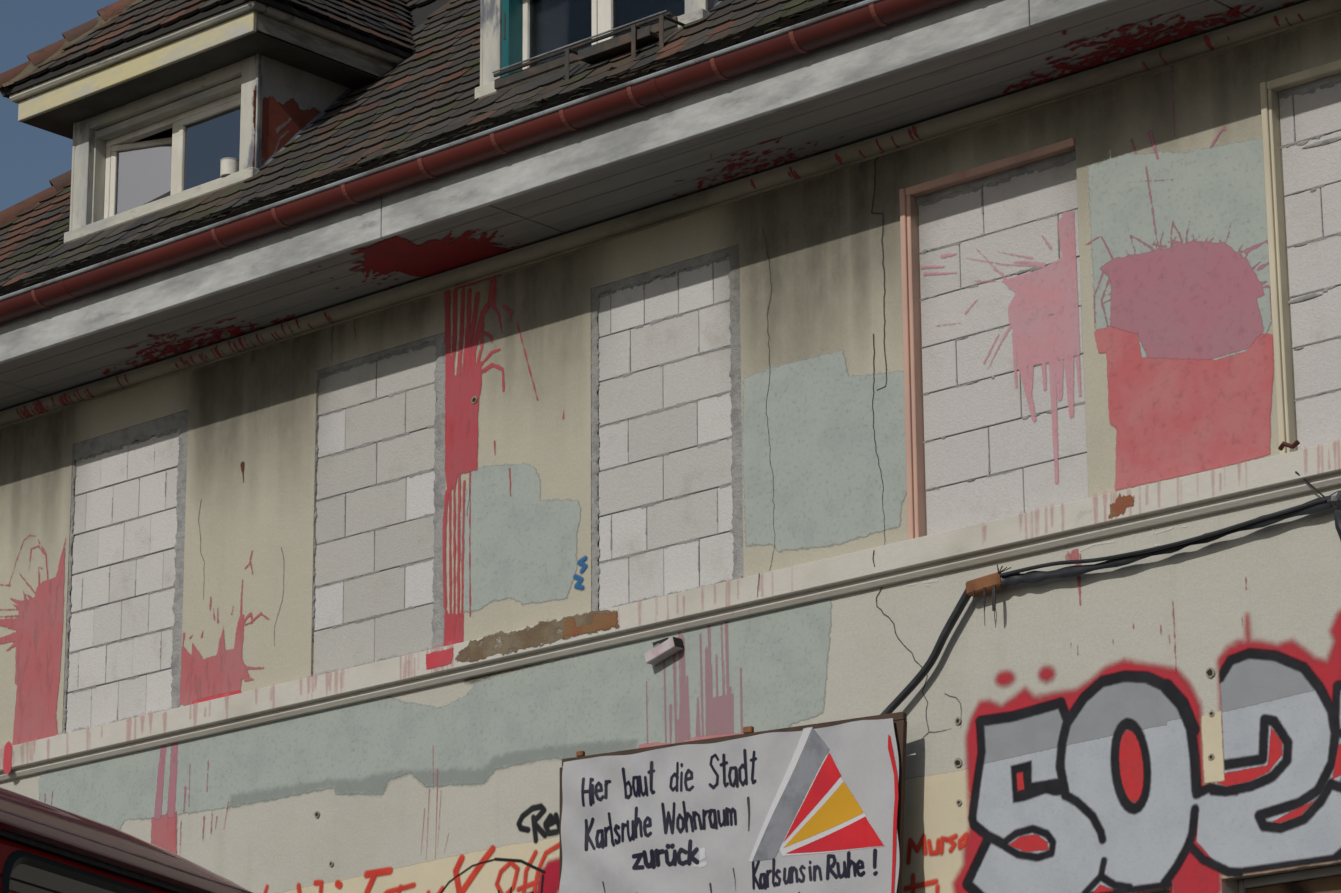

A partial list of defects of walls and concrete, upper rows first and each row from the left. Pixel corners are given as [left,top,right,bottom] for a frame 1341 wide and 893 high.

peeling [455,610,619,662]
crack [871,152,961,735]